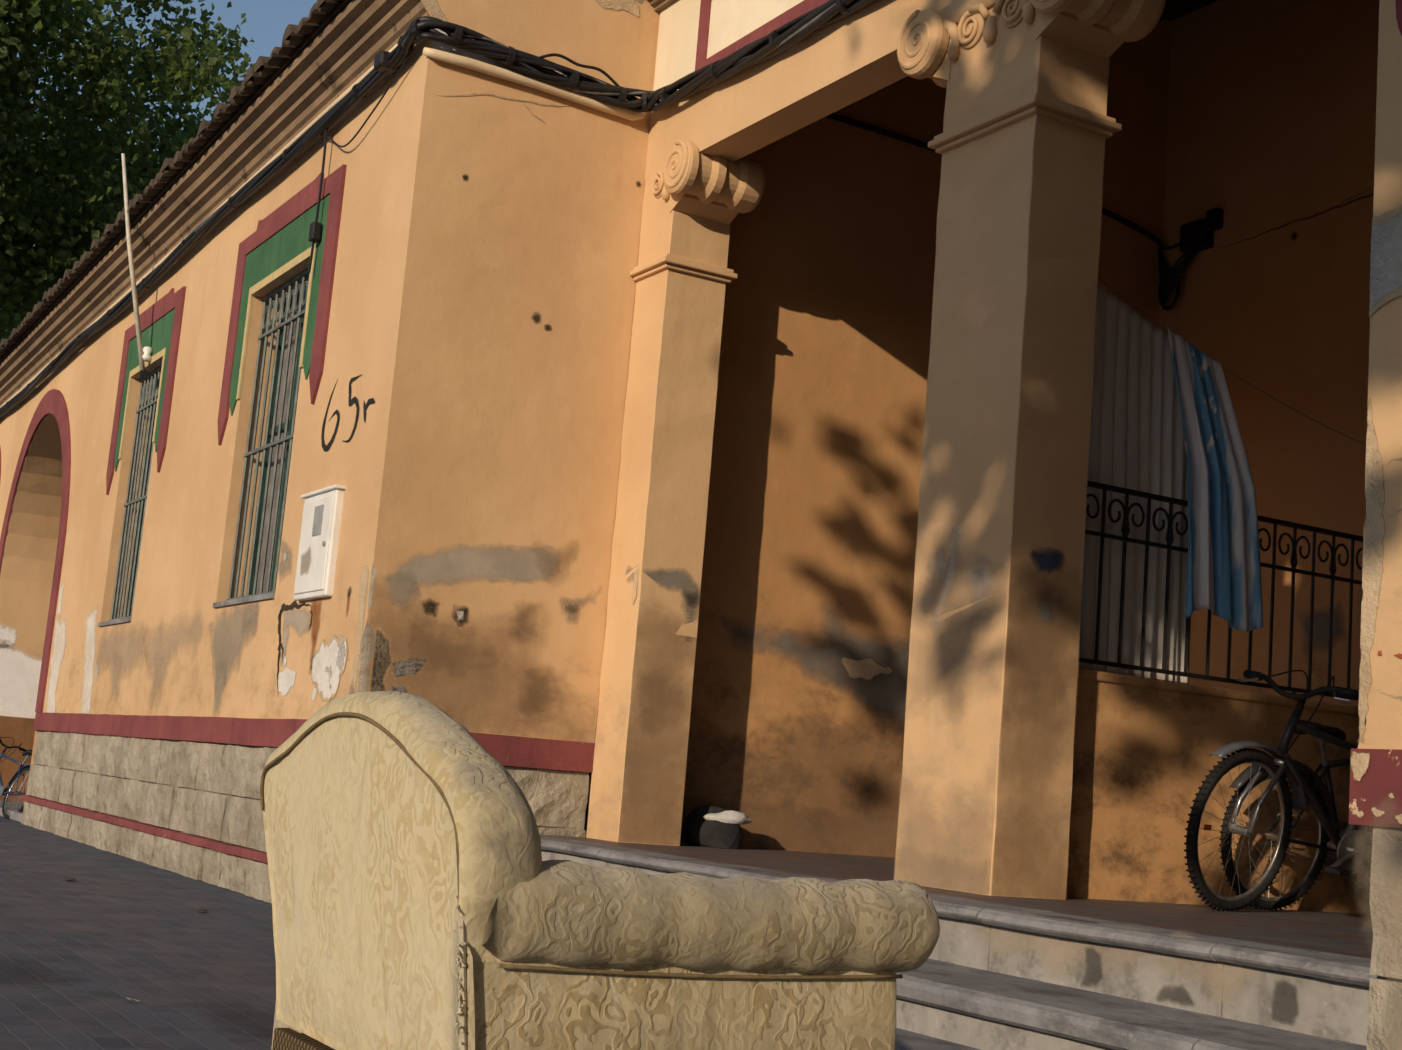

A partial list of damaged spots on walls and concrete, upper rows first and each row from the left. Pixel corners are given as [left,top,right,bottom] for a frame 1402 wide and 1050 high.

flaking render [421,0,584,95]
crack [1217,188,1374,249]
spalling [1369,205,1402,316]
peeling [0,582,66,719]
flaking render [81,609,99,714]
damp [101,603,257,709]
flaking render [278,563,427,702]
damp [732,621,909,723]